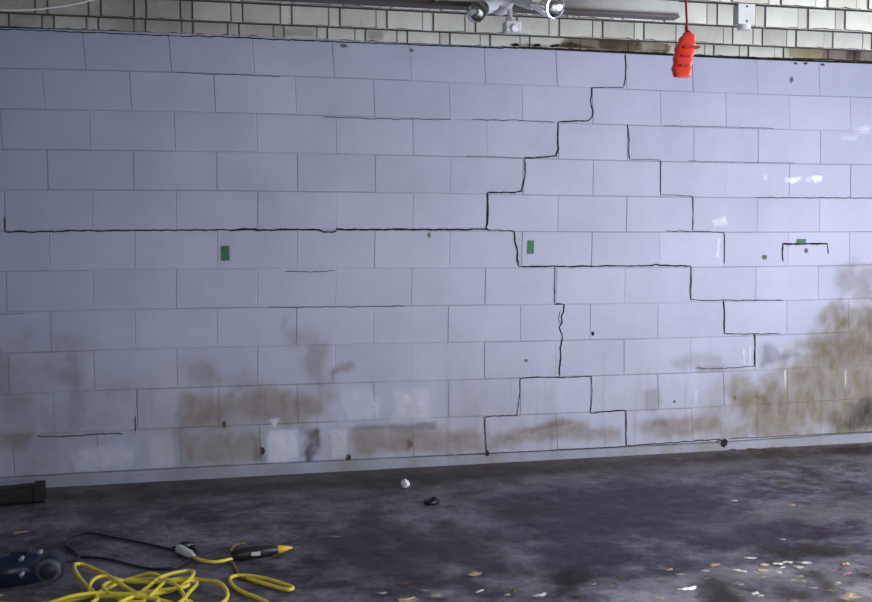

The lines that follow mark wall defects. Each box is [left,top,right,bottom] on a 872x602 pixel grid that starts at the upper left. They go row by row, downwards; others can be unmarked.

crack [4,54,872,456]
water stain [743,319,872,438]